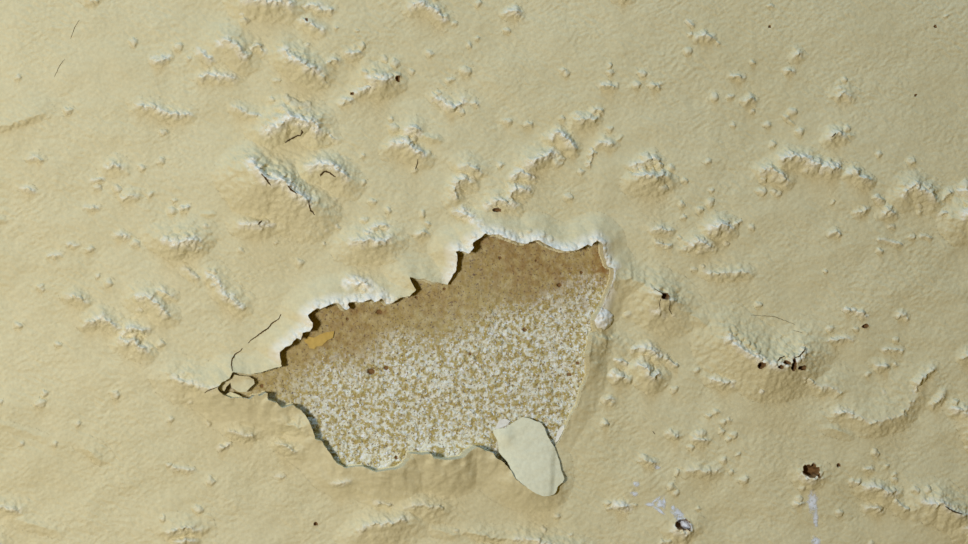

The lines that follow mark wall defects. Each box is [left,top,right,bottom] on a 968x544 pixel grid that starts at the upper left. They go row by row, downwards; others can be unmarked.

peeling [197,206,635,513]